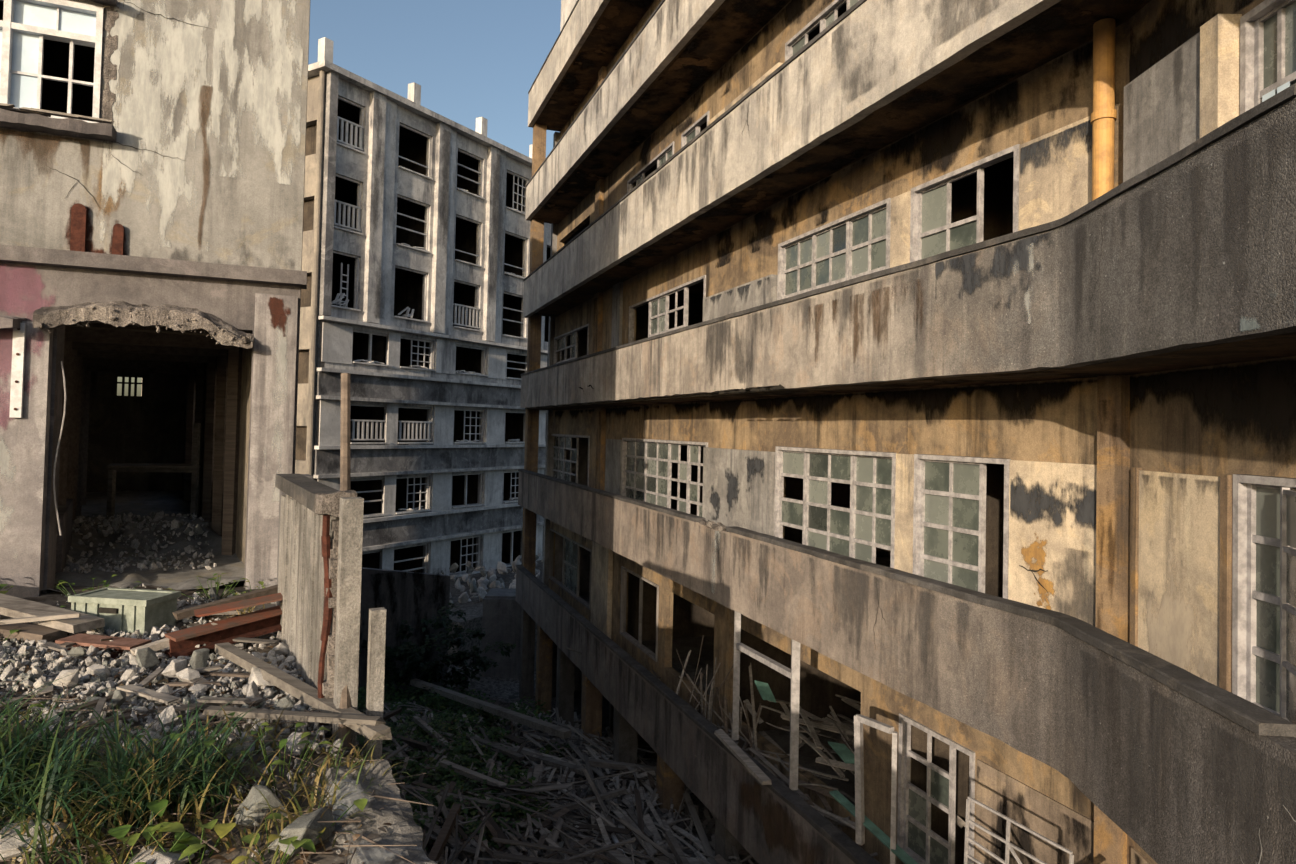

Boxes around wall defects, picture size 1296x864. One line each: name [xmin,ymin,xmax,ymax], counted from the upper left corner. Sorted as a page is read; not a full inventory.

peeling [100,0,303,247]
rust [198,85,212,246]
rust [268,297,290,337]
damp [706,277,770,303]
damp [804,281,889,358]
damp [935,233,1050,323]
damp [555,323,1105,424]
damp [1130,359,1296,464]
peeling [1021,537,1055,610]